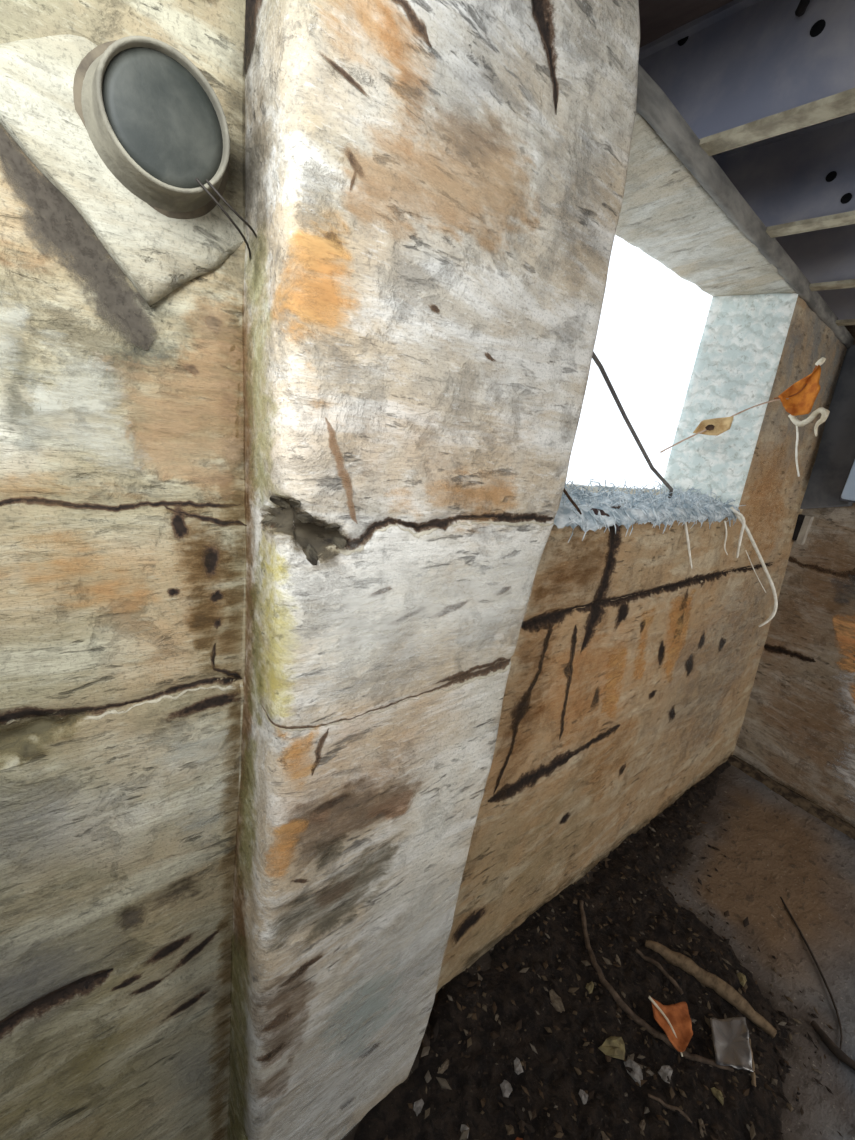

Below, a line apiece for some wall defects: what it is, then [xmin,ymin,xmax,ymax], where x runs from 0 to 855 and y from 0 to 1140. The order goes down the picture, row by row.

crack [0,496,554,555]
spalling [260,495,347,565]
crack [0,505,773,803]